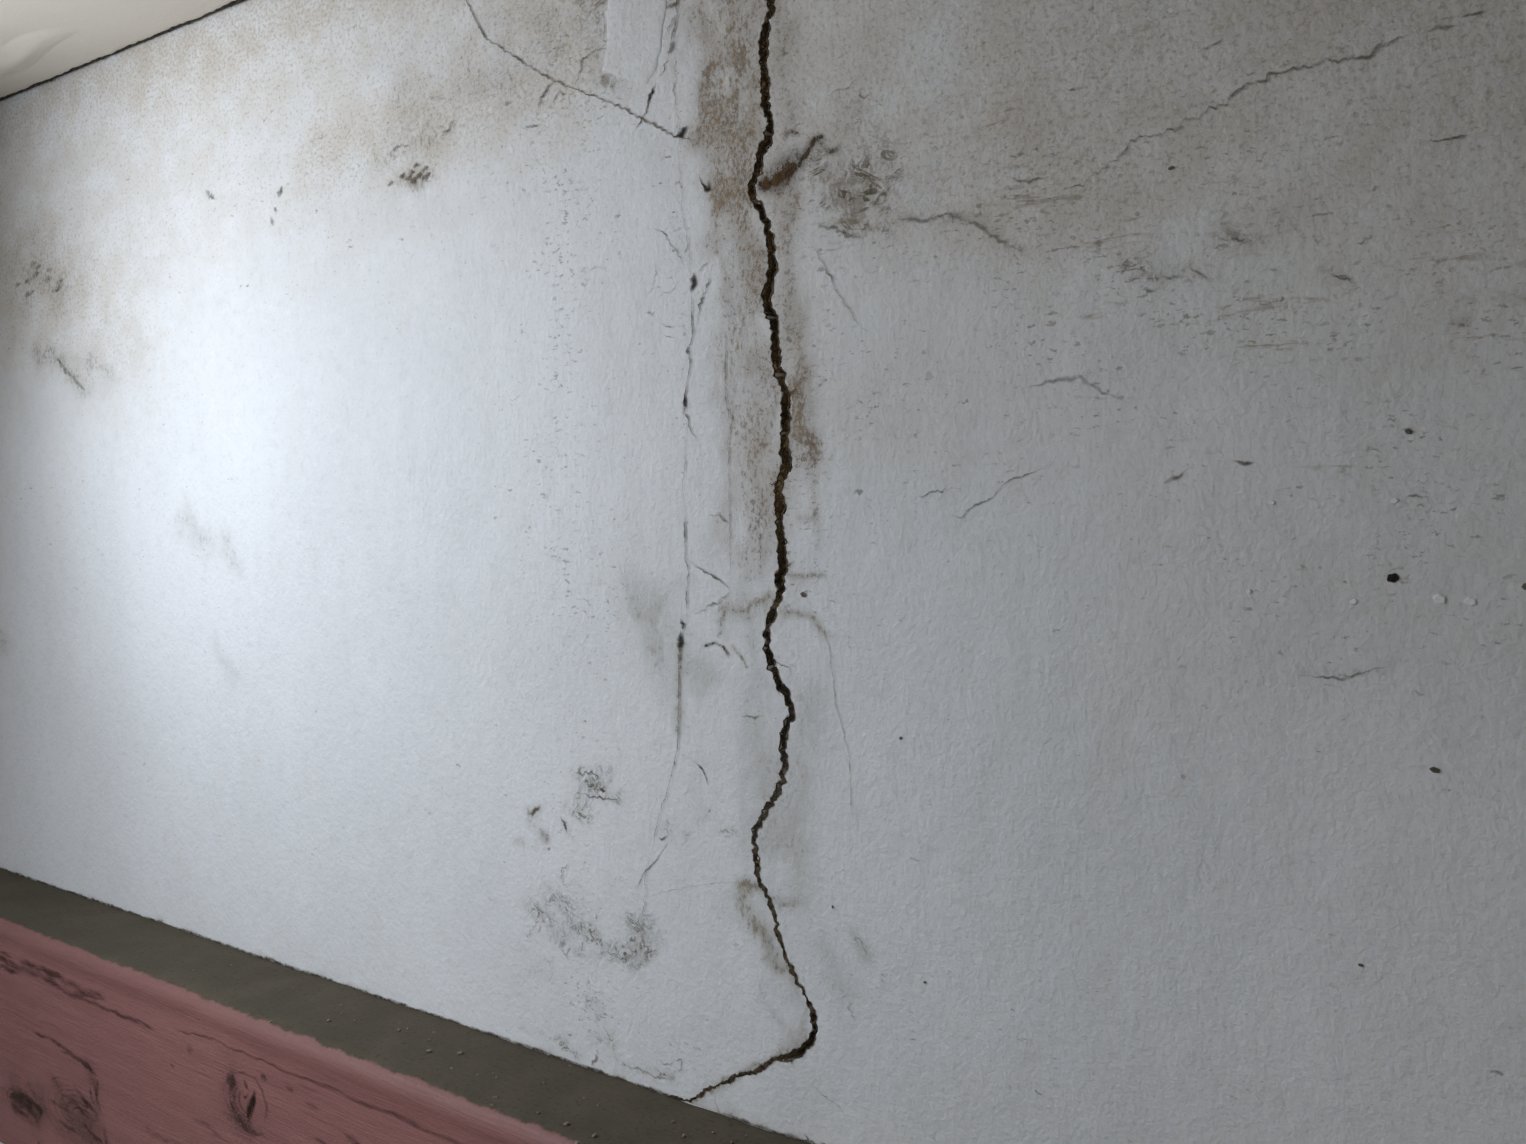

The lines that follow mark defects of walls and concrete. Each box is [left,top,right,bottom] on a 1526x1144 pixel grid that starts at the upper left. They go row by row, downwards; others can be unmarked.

crack [466,0,688,143]
crack [654,0,818,1103]
leakage [690,0,822,567]
crack [1206,38,1397,112]